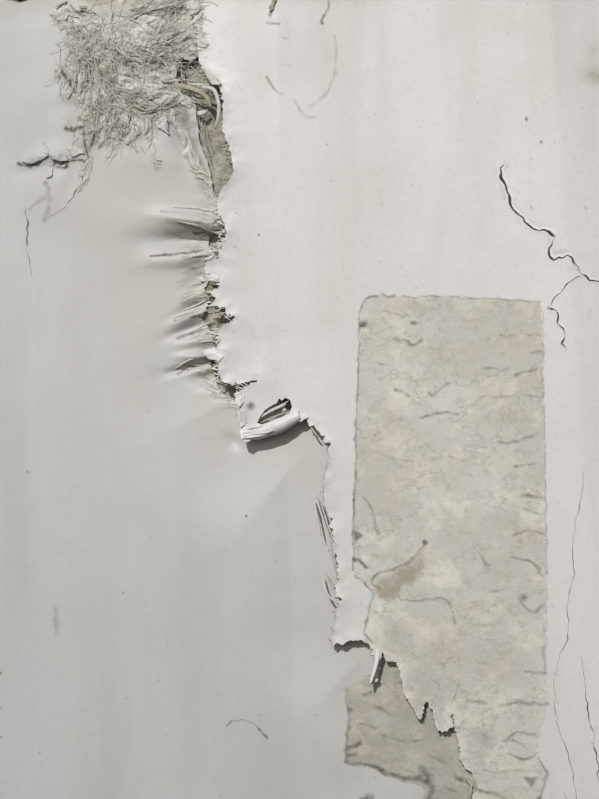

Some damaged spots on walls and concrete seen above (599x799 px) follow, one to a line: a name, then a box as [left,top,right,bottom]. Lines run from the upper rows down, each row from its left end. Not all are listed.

crack [496,159,599,351]
crack [551,469,599,799]